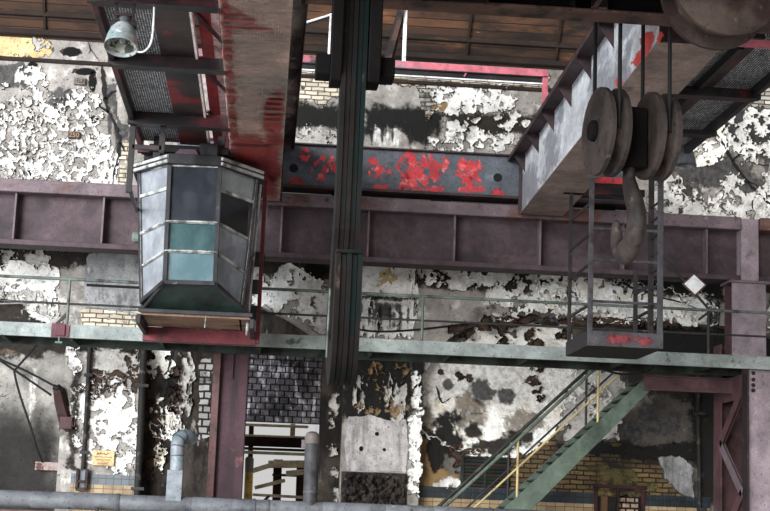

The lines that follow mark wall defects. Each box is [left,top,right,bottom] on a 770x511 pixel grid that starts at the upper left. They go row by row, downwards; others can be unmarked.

peeling [0,36,129,185]
water stain [297,100,338,132]
flaking render [299,71,339,109]
water stain [364,103,535,147]
peeling [394,72,551,154]
peeling [0,249,66,324]
peeling [251,263,328,335]
peeling [360,266,719,347]
peeling [64,346,213,483]
water stain [338,360,568,474]
peeling [326,361,626,505]
flaking render [551,420,694,498]